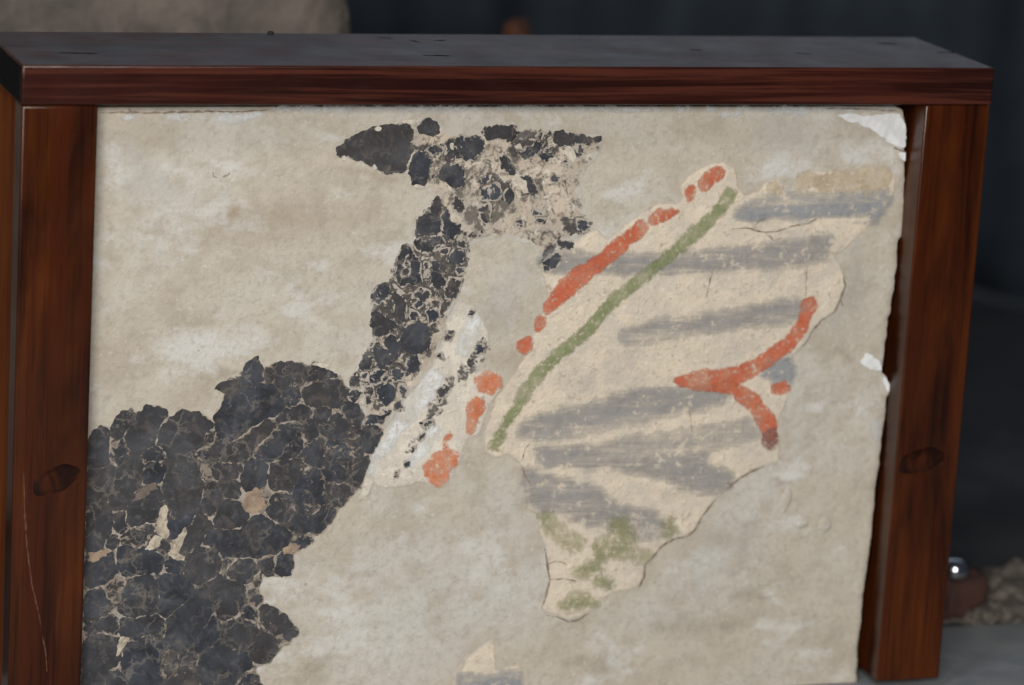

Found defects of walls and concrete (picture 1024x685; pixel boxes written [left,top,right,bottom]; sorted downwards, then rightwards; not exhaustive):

spalling [773,107,906,161]
crack [736,218,817,241]
spalling [859,353,890,392]
crack [639,466,765,587]
crack [542,548,589,623]